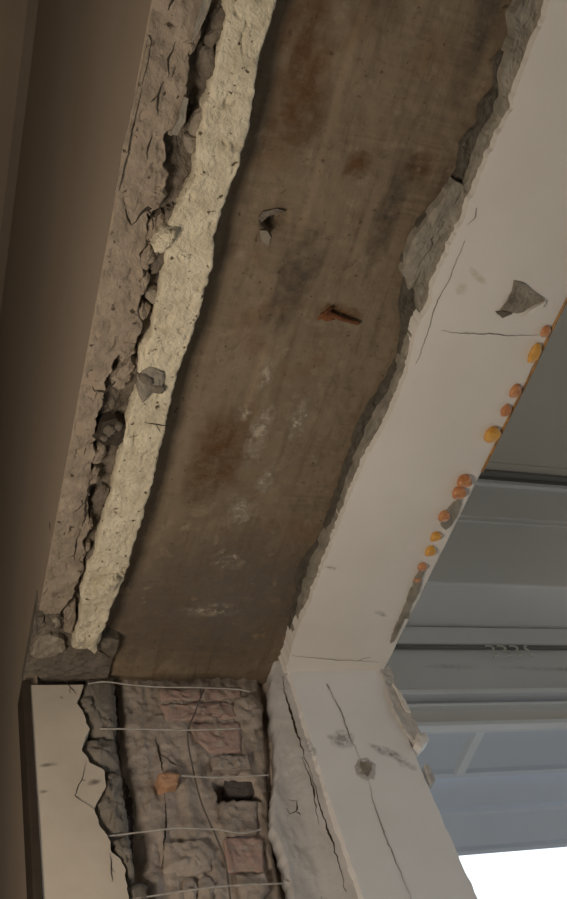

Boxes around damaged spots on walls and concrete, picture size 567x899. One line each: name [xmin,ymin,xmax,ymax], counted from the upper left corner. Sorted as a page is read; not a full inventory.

peeling [192,0,211,41]
peeling [170,95,189,136]
flaking render [92,409,126,446]
crack [72,0,225,601]
spalling [136,366,165,403]
peeling [258,208,286,246]
flaking render [288,0,546,643]
crack [416,211,534,363]
flaking render [21,590,148,899]
flaking render [159,688,269,899]
crack [326,683,410,895]